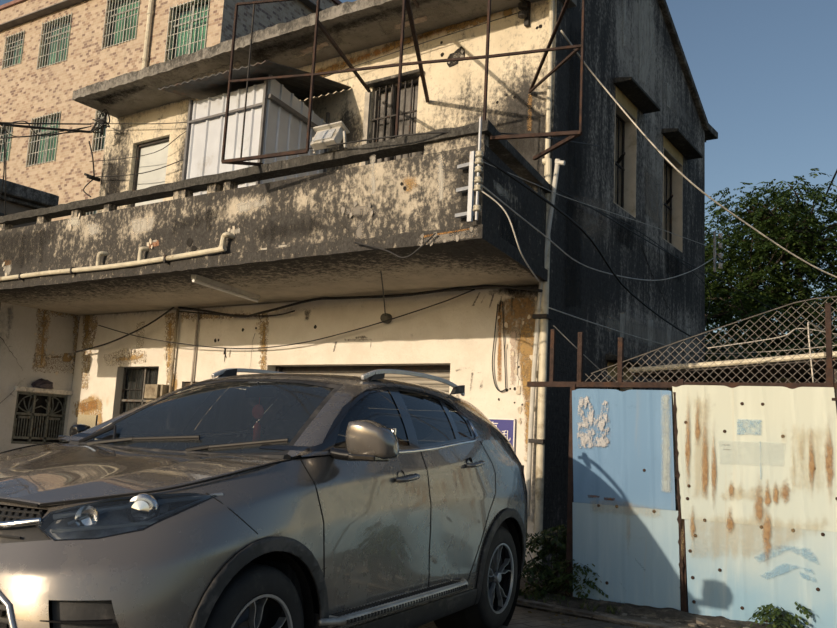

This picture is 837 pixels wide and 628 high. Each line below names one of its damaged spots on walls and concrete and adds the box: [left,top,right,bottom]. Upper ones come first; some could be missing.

water stain [315,16,487,76]
water stain [132,217,154,233]
peeling [32,309,98,390]
peeling [497,296,538,444]
peeling [577,396,609,448]
corrosion [685,410,716,492]
corrosion [825,438,833,484]
corrosion [755,485,788,555]